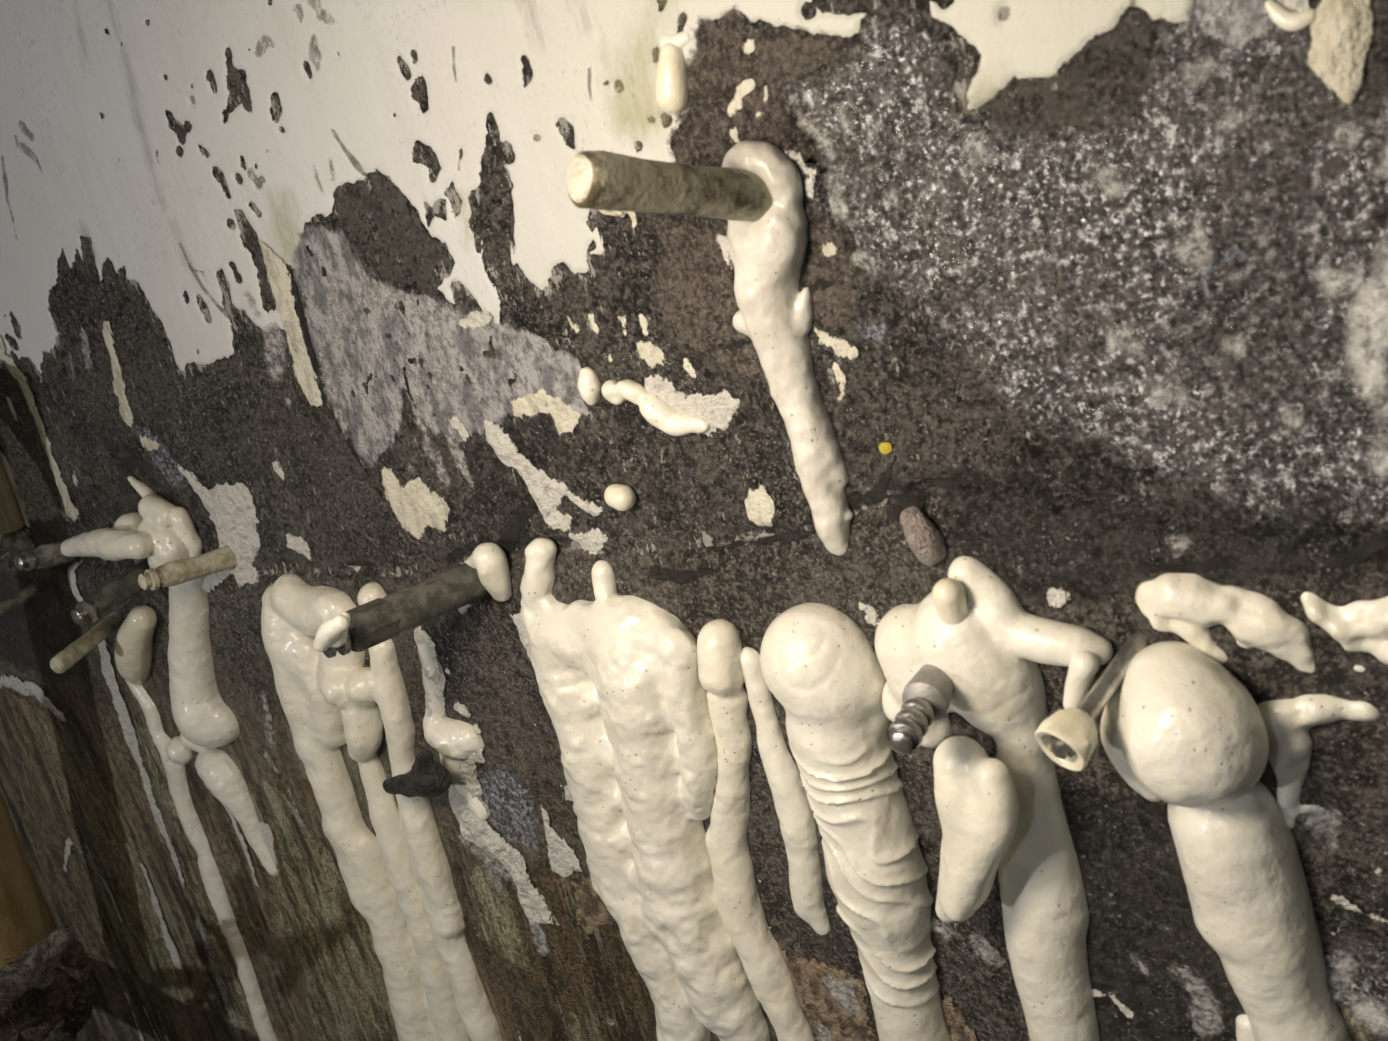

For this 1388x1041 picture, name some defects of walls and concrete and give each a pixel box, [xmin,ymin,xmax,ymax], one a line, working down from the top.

peeling [190,47,252,124]
peeling [270,92,285,133]
peeling [397,50,428,114]
peeling [521,55,532,87]
peeling [604,80,624,93]
peeling [647,0,1388,535]
peeling [0,109,815,579]